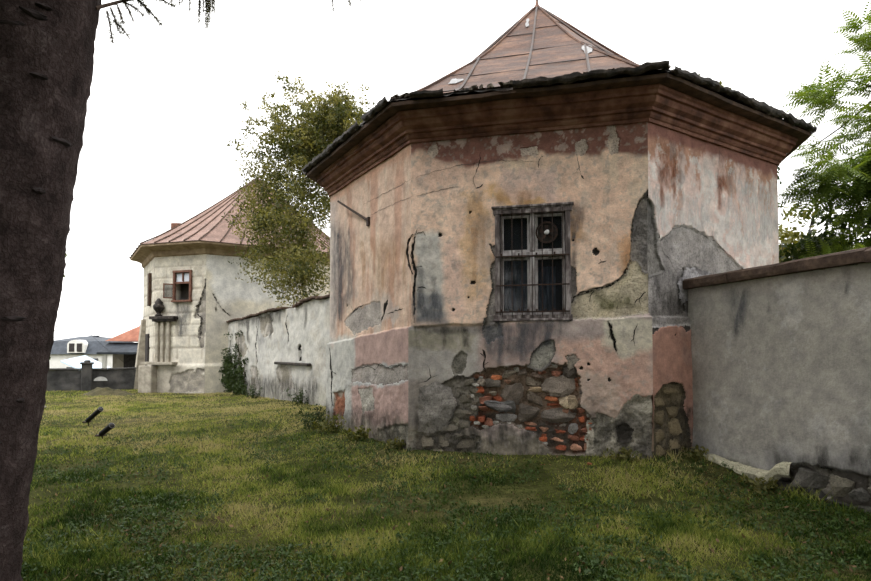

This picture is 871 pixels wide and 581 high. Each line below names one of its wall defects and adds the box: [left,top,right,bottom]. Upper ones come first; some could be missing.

peeling [607,125,620,155]
crack [363,152,543,216]
spalling [630,190,665,279]
crack [350,230,426,323]
crack [608,323,637,352]
flaking render [465,362,595,455]
flaking render [652,382,692,458]